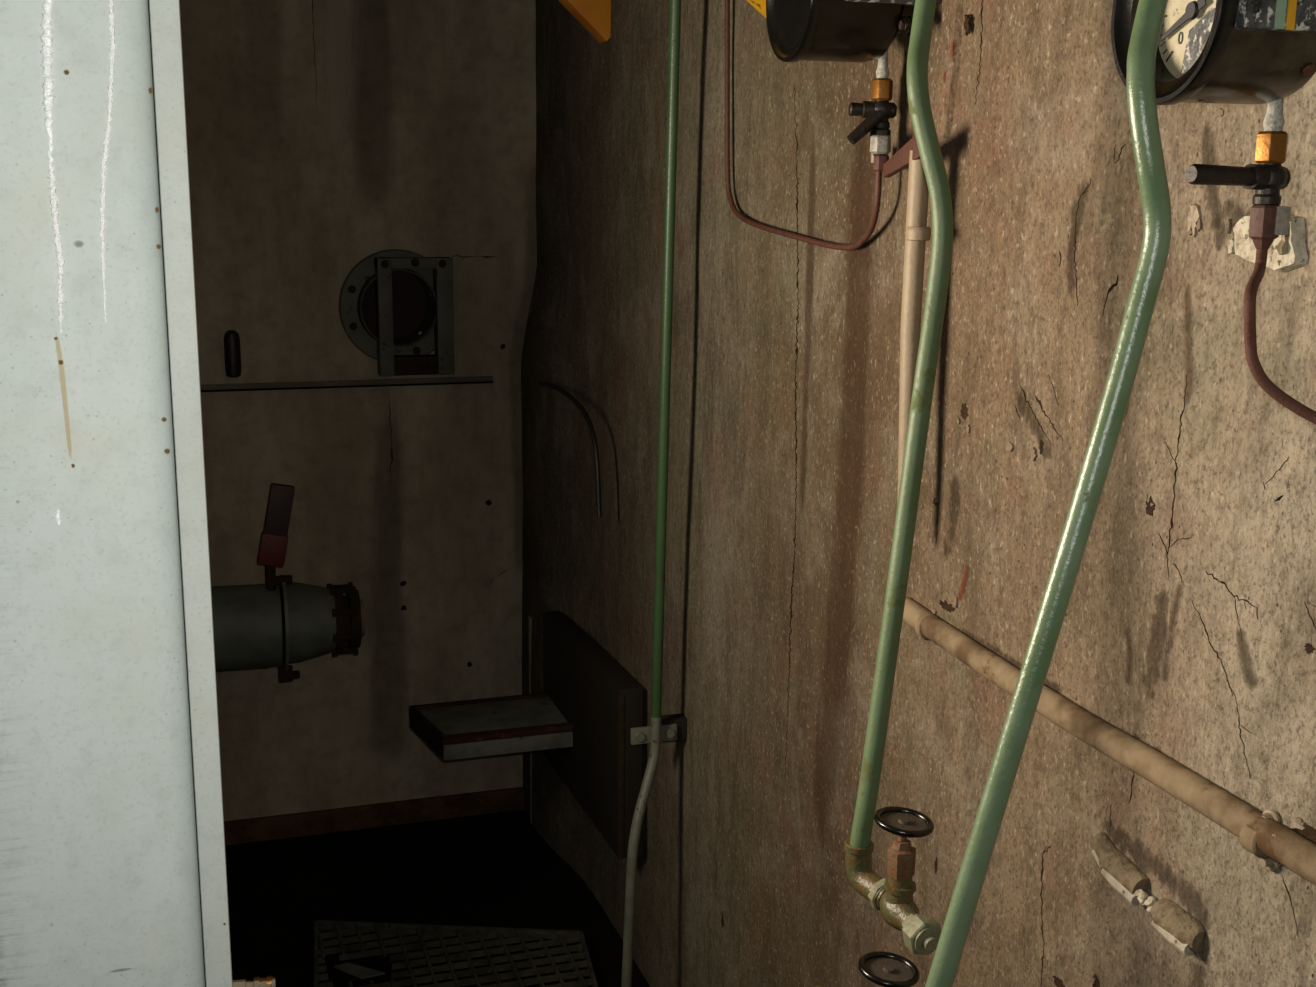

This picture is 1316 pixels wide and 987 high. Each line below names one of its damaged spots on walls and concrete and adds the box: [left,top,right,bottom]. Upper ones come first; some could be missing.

crack [1159,375,1258,779]
crack [1263,456,1289,501]